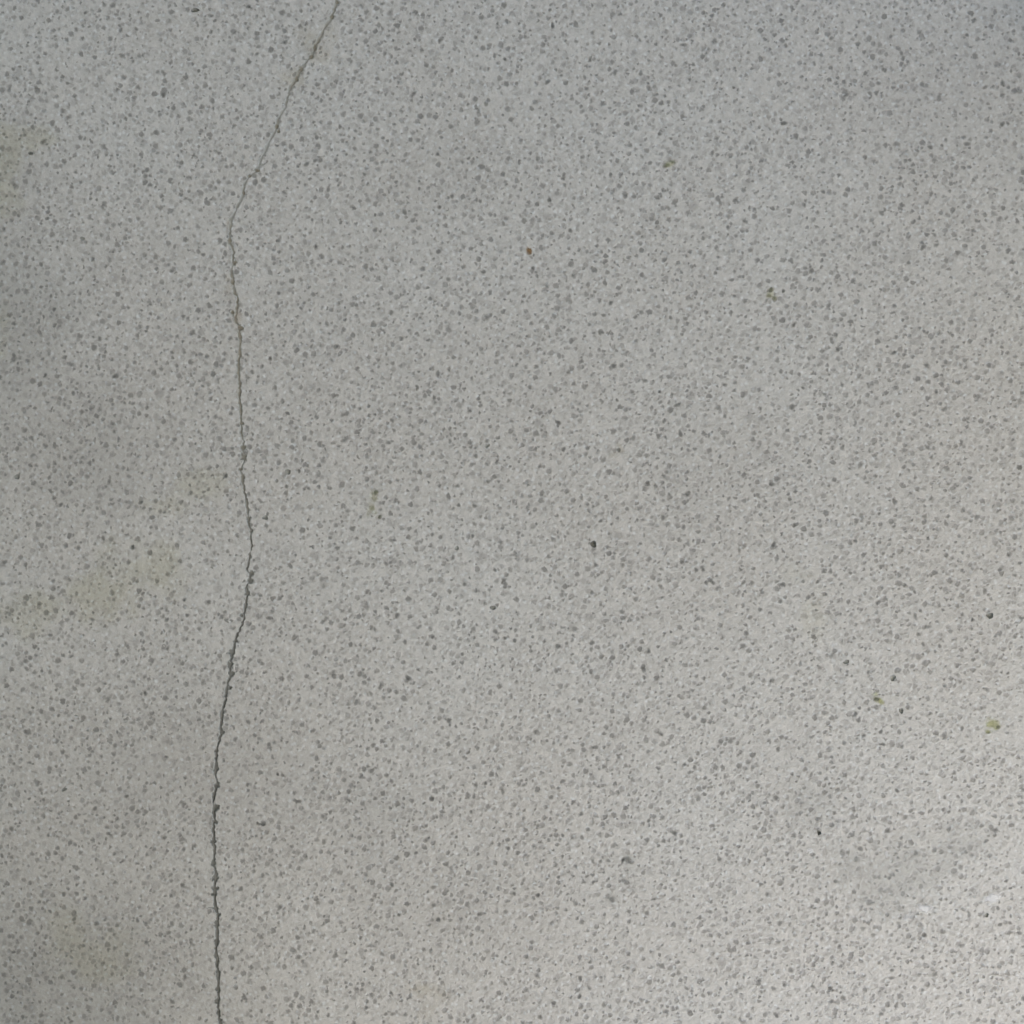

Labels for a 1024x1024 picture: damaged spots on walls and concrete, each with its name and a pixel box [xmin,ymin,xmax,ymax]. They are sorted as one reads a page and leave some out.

crack [206,0,340,1024]